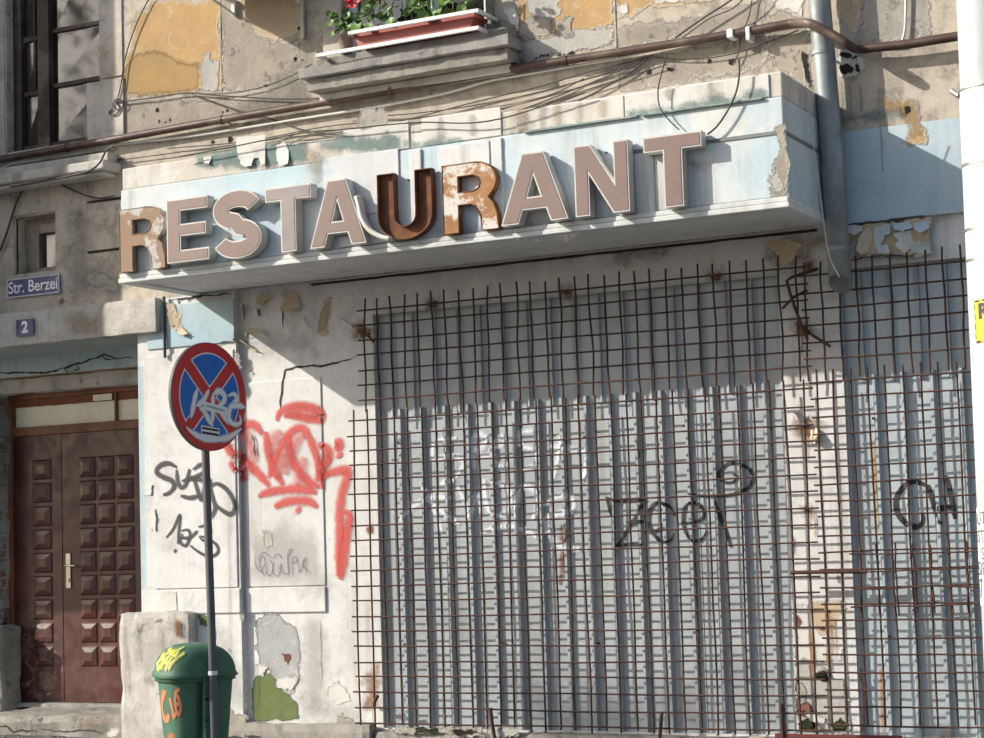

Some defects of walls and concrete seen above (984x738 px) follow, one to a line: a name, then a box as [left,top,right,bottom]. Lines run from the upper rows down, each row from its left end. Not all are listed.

spalling [124,10,310,138]
spalling [519,0,813,93]
spalling [836,0,933,78]
peeling [195,135,307,170]
spalling [767,124,790,203]
spalling [879,96,928,147]
peeling [848,216,933,260]
crack [0,354,134,374]
crack [279,356,357,408]
rust [796,420,815,450]
spalling [230,611,301,723]
spalling [792,599,851,735]